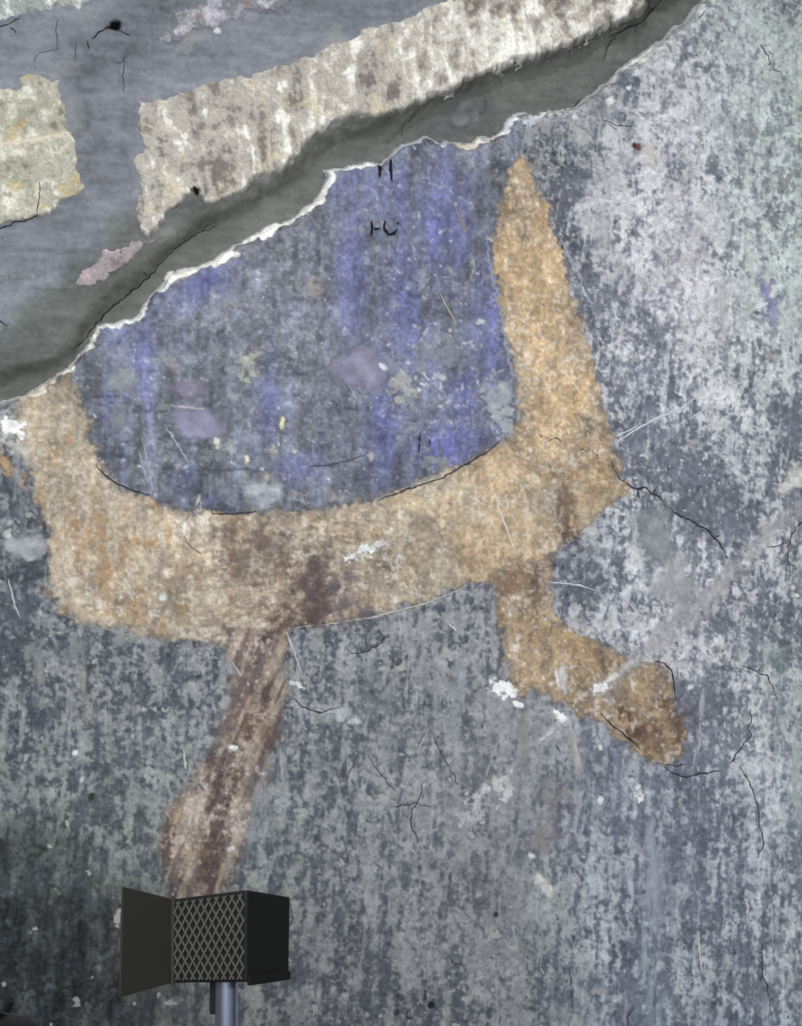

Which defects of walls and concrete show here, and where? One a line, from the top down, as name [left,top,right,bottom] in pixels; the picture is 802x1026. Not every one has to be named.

spalling [610,43,676,90]
spalling [390,104,589,157]
spalling [157,162,377,292]
spalling [82,303,147,354]
spalling [20,364,75,402]
spalling [235,352,261,384]
spalling [379,363,418,404]
spalling [479,371,527,439]
spalling [0,416,29,459]
crack [539,434,729,559]
crack [346,755,430,843]
crack [664,710,764,858]